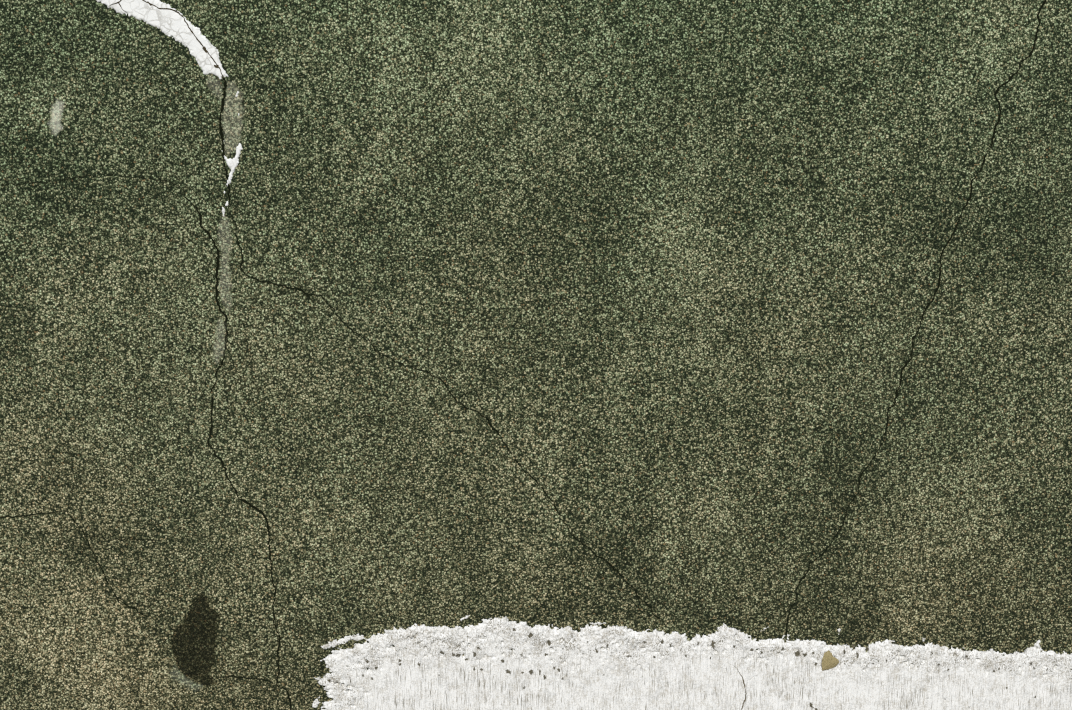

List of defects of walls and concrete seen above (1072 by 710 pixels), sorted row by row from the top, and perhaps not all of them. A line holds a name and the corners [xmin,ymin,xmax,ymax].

crack [0,0,666,710]
crack [785,0,1046,636]
leakage [175,598,216,687]
peeling [321,634,367,649]
flaking render [781,634,869,671]